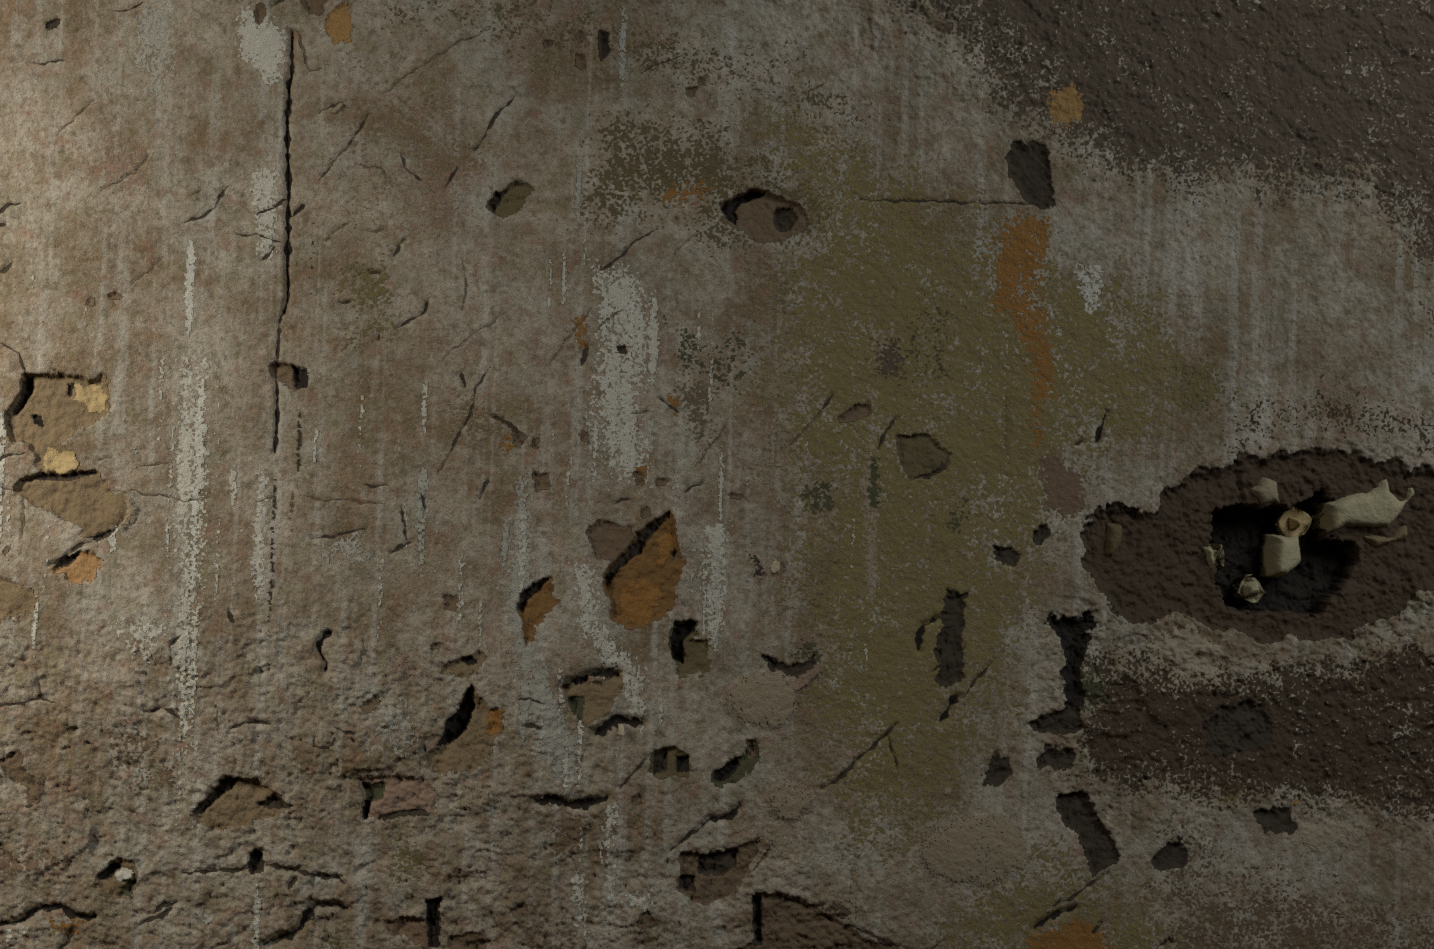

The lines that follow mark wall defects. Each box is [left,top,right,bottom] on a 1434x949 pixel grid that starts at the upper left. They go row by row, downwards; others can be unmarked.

crack [183,0,515,451]
spalling [486,180,534,218]
spalling [720,189,809,244]
spalling [4,371,129,584]
crack [256,260,523,553]
spalling [517,577,560,644]
spalling [586,511,712,679]
spalling [1044,611,1100,713]
spalling [1080,447,1434,644]